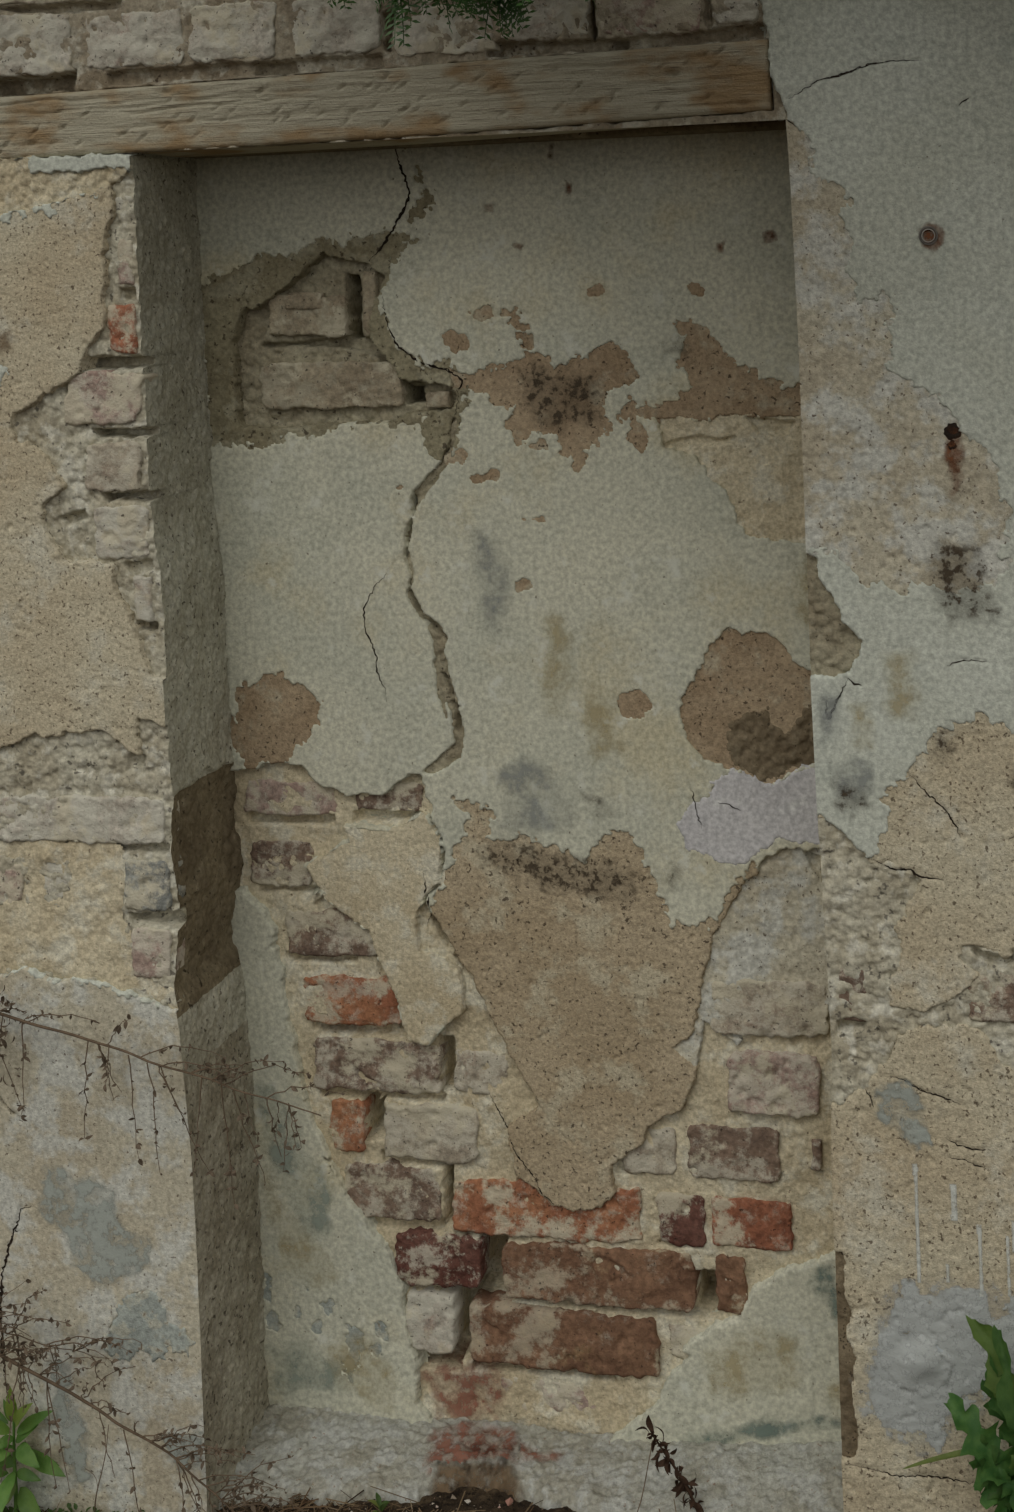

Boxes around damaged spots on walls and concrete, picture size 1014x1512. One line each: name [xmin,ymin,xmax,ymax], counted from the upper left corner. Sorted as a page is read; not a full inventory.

peeling [0,146,236,1512]
flaking render [0,0,769,97]
crack [363,149,464,778]
flaking render [201,82,1014,1512]